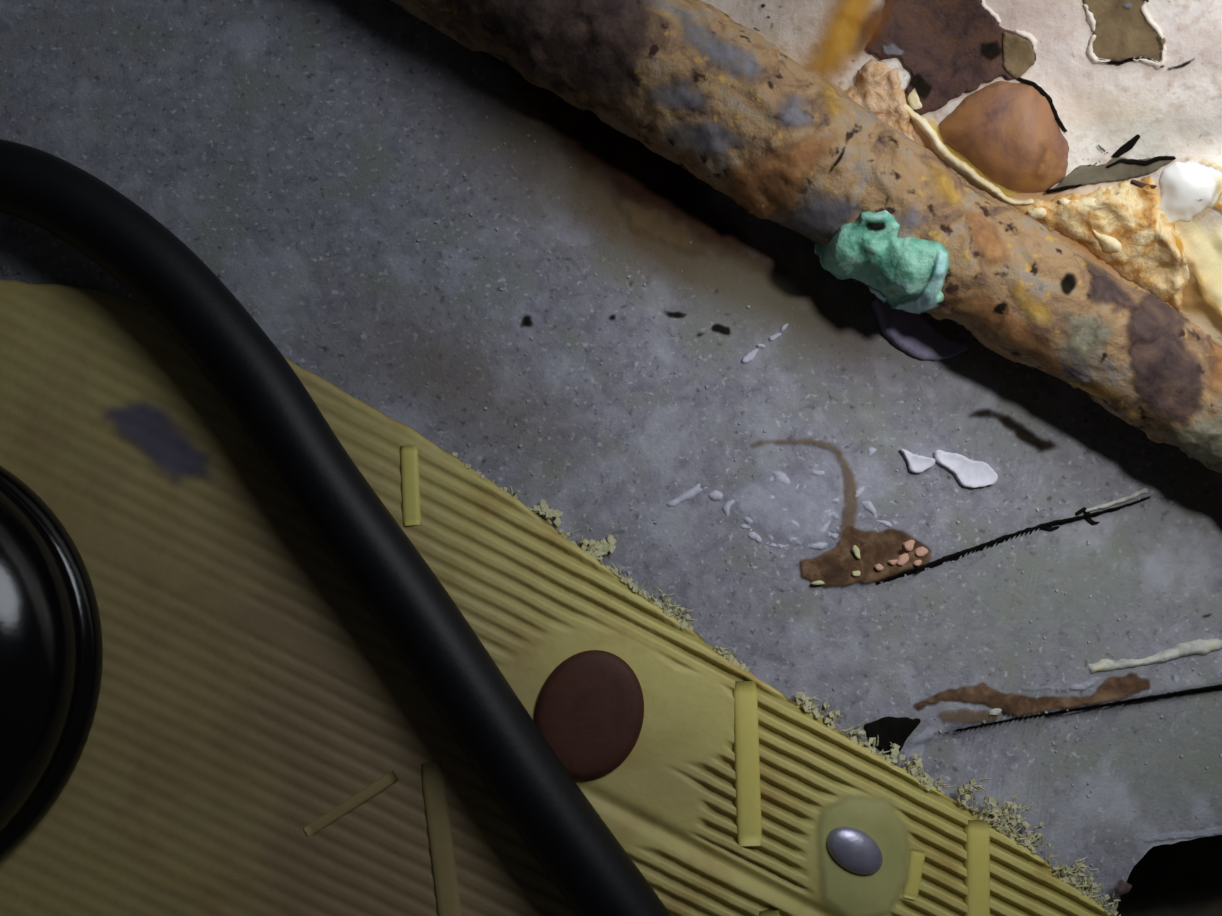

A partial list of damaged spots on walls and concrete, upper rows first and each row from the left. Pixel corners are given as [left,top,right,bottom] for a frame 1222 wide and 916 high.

corrosion [446,0,743,252]
corrosion [730,138,830,219]
corrosion [813,0,917,142]
peeling [866,0,1176,205]
corrosion [814,210,1119,398]
corrosion [929,77,1222,425]
crack [876,488,1151,585]
crack [934,684,1222,734]
spalling [1145,827,1222,841]